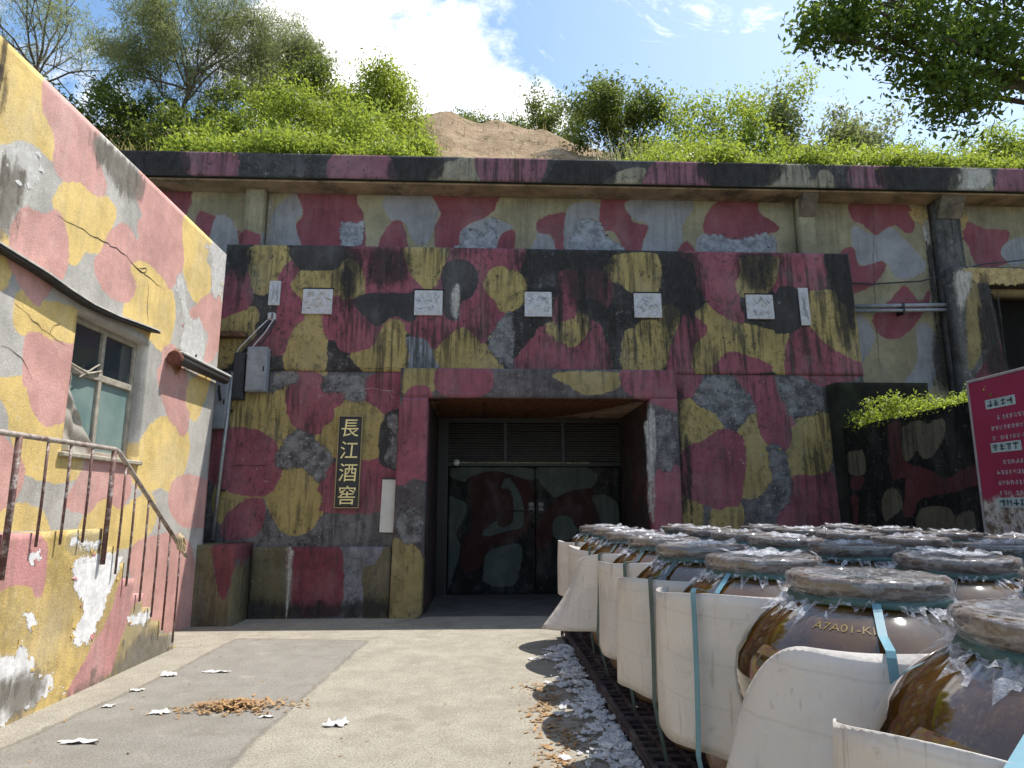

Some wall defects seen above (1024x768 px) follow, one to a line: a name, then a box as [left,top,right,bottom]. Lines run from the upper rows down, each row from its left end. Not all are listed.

crack [59,216,165,321]
damp [340,246,410,316]
damp [451,284,460,318]
damp [517,250,616,360]
damp [663,252,705,354]
damp [736,253,777,292]
damp [826,254,855,349]
peeling [70,533,123,648]
peeling [0,609,69,728]